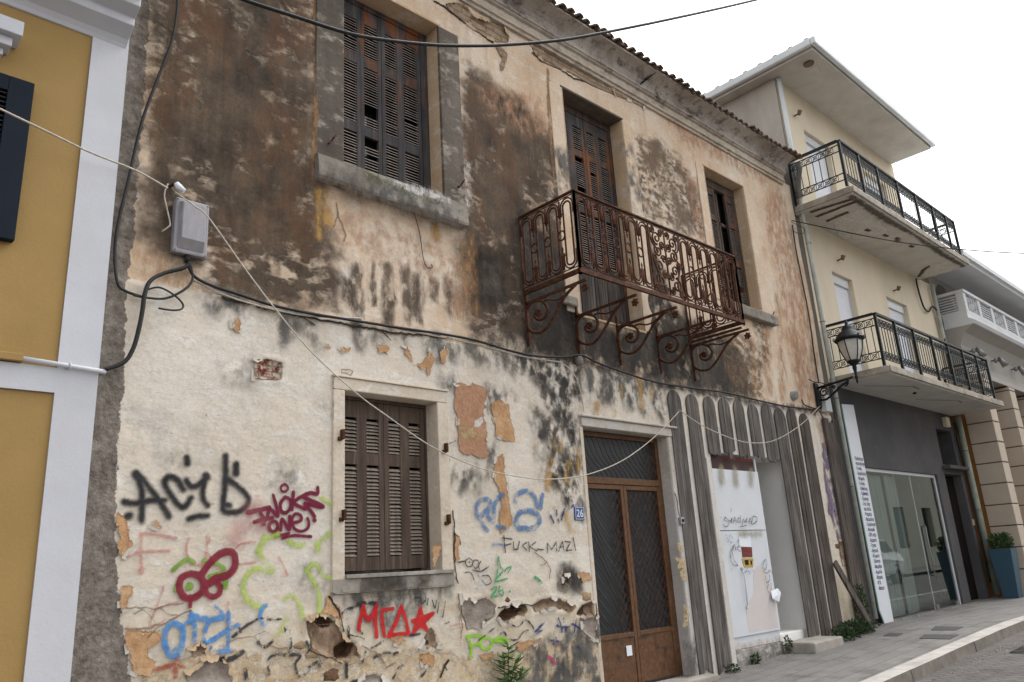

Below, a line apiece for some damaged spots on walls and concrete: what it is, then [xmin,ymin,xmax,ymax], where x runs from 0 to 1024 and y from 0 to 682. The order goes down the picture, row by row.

spalling [447,3,510,70]
damp [136,0,818,415]
spalling [251,357,283,382]
peeling [377,344,448,376]
peeling [453,382,515,534]
peeling [116,512,133,560]
peeling [117,585,133,613]
peeling [124,571,604,682]